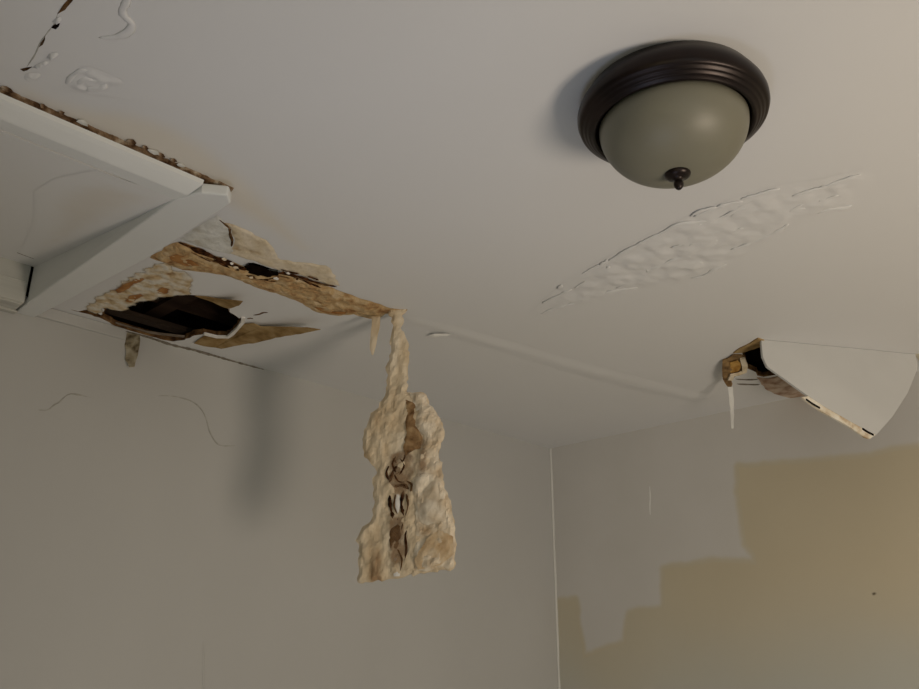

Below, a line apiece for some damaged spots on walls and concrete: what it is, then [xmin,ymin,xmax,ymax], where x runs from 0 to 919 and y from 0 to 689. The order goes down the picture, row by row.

crack [21,0,73,81]
flaking render [180,216,233,254]
spalling [74,308,241,367]
spalling [742,353,775,377]
peeling [551,371,919,658]